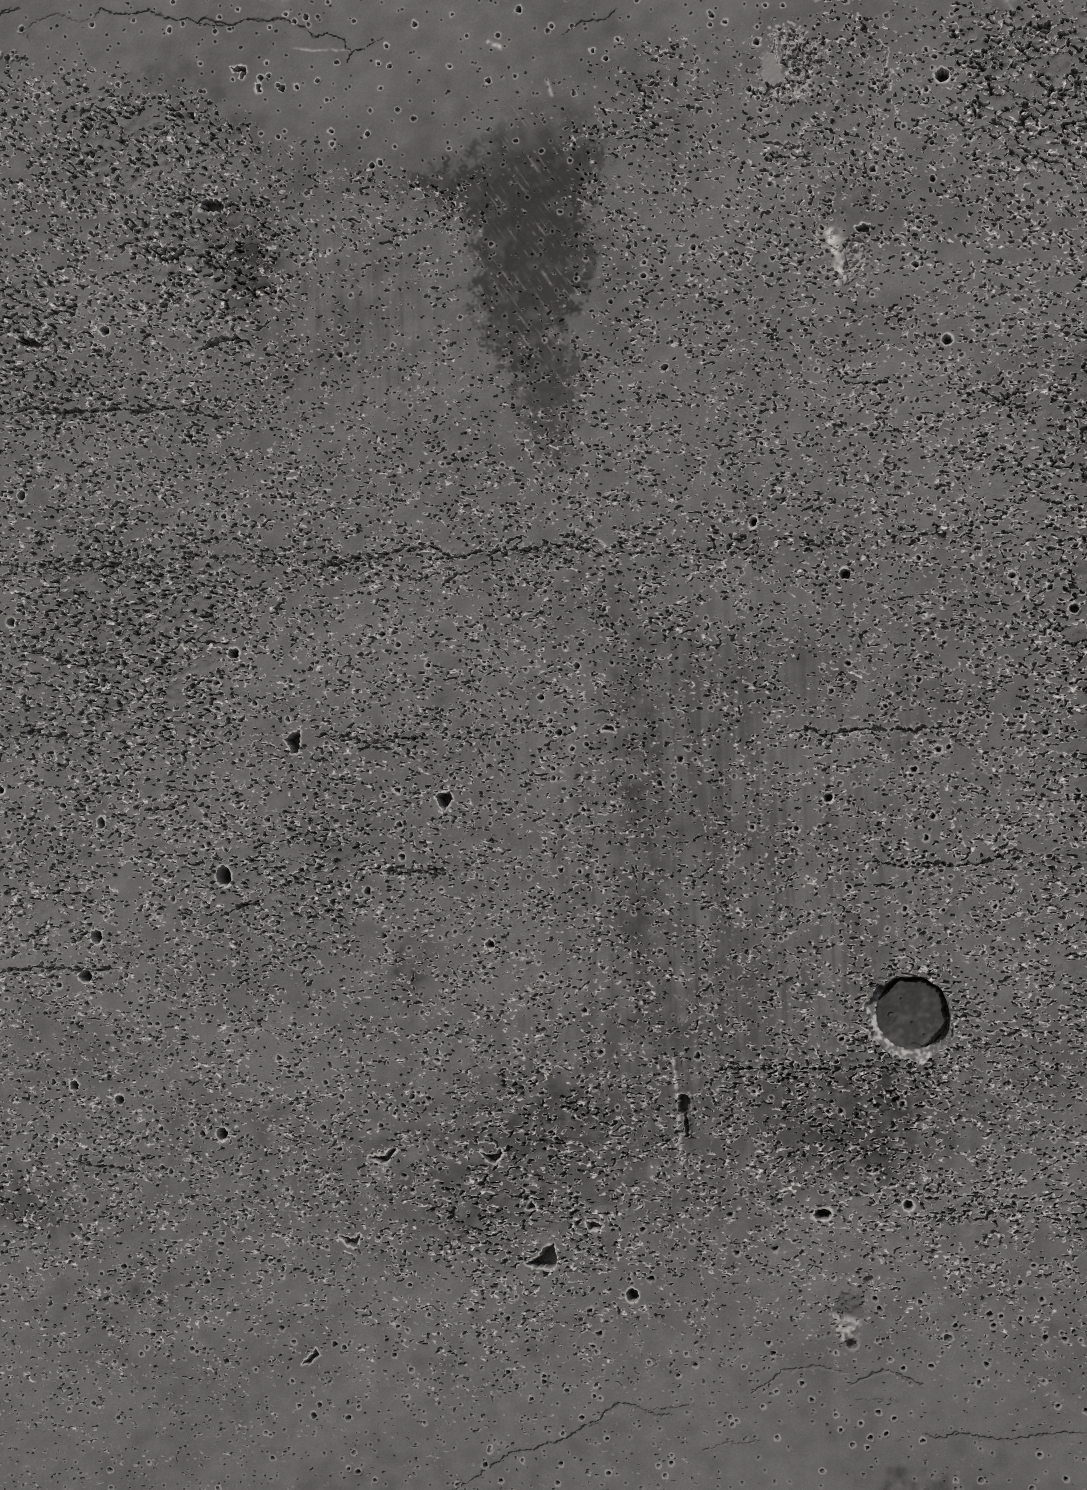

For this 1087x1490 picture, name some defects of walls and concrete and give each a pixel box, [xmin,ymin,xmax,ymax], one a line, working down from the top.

crack [0,7,385,63]
leakage [610,68,740,202]
leakage [817,181,878,288]
leakage [385,85,609,478]
crack [0,530,607,589]
crack [801,540,851,548]
crack [749,1364,926,1395]
crack [454,1402,693,1490]
crack [922,1431,1087,1443]